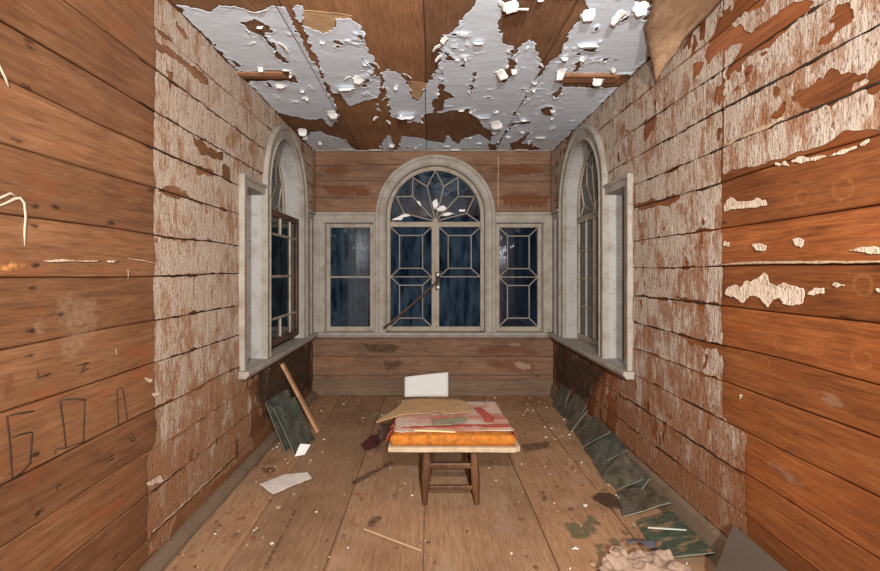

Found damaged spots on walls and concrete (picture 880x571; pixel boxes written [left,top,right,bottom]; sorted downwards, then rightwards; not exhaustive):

peeling [147,0,425,556]
peeling [398,0,880,536]